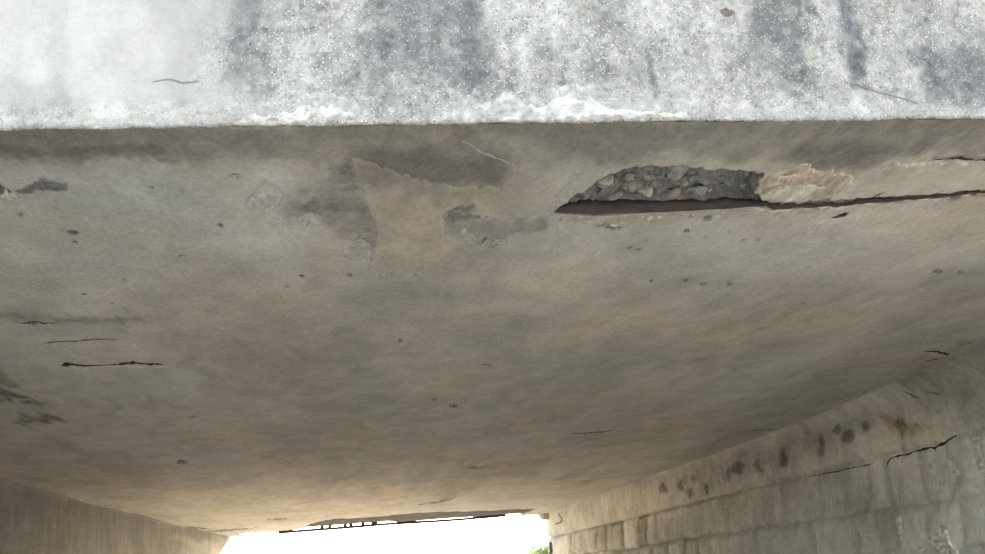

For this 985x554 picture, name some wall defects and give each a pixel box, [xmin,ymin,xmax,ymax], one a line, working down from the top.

crack [929,154,985,162]
spalling [0,178,68,200]
spalling [553,158,985,230]
crack [752,190,985,213]
crack [809,433,957,477]